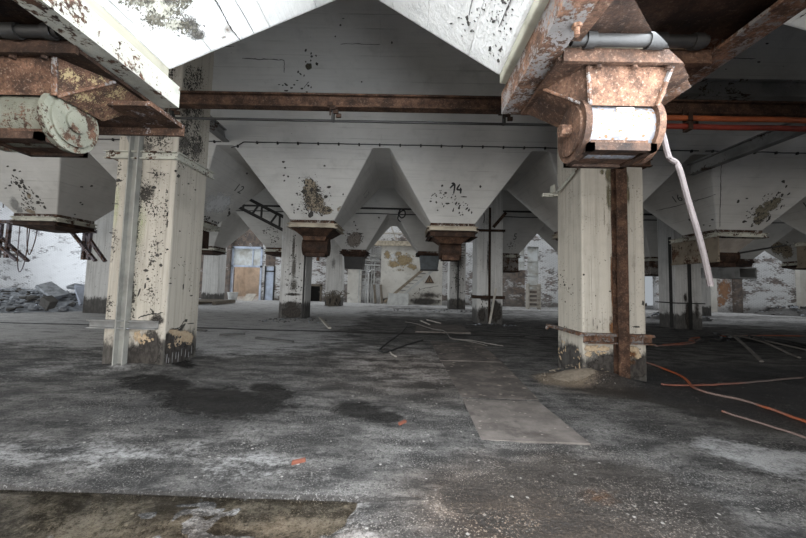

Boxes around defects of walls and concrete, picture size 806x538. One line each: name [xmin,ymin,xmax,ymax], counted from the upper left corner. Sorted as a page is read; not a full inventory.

damp [118,0,206,41]
crack [215,0,254,41]
damp [168,62,207,91]
damp [143,109,206,169]
spalling [127,314,195,364]
spalling [558,340,614,373]